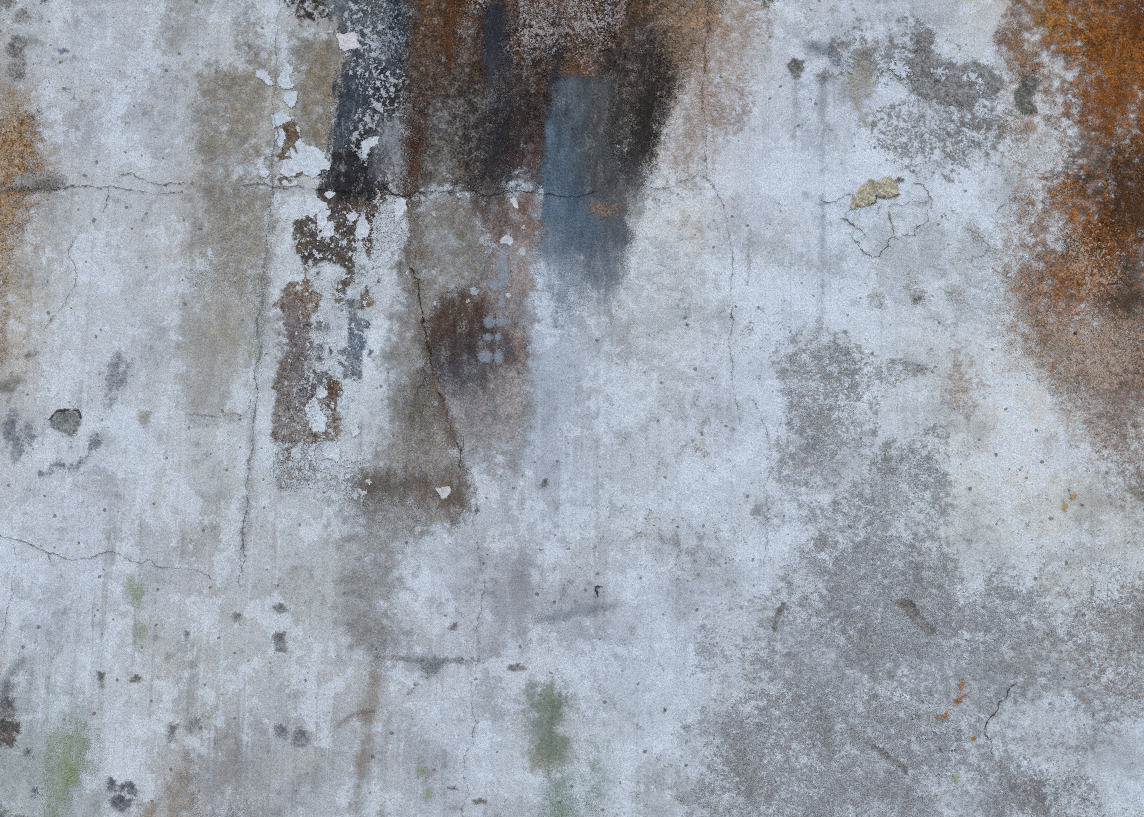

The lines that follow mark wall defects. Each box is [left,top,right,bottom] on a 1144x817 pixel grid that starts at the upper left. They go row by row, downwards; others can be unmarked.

corrosion [0,86,58,362]
crack [0,0,597,640]
peeling [292,0,326,19]
flaking render [188,6,494,537]
damp [425,71,643,475]
corrosion [397,0,769,205]
spalling [787,15,1040,209]
crack [821,162,1017,277]
corrosion [936,351,973,412]
corrosion [963,0,1144,518]
peeling [664,324,1144,817]